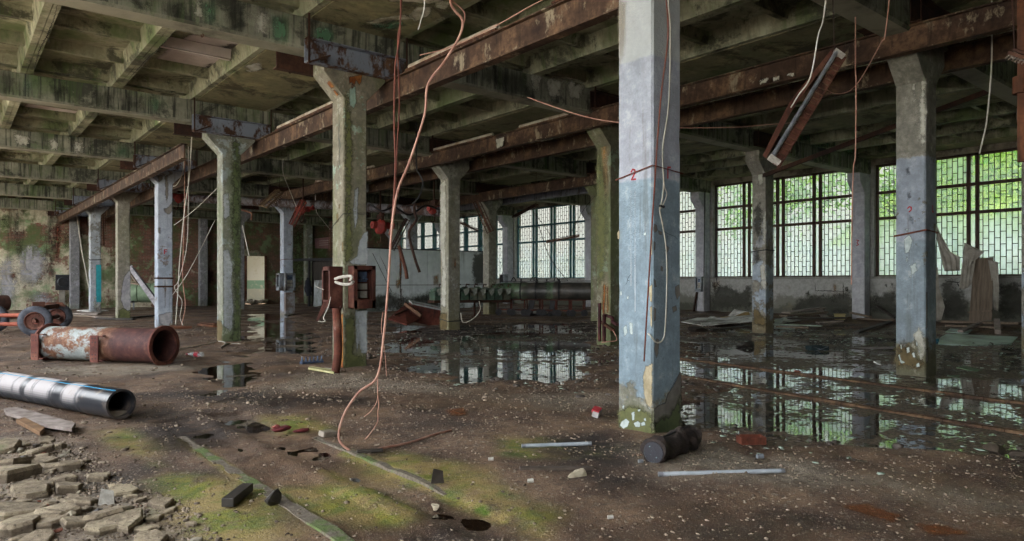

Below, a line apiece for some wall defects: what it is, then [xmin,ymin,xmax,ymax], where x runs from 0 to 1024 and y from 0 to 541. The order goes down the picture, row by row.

water stain [711,284,766,327]
water stain [792,291,852,314]
water stain [871,291,896,315]
water stain [998,282,1022,319]
spalling [620,339,681,433]